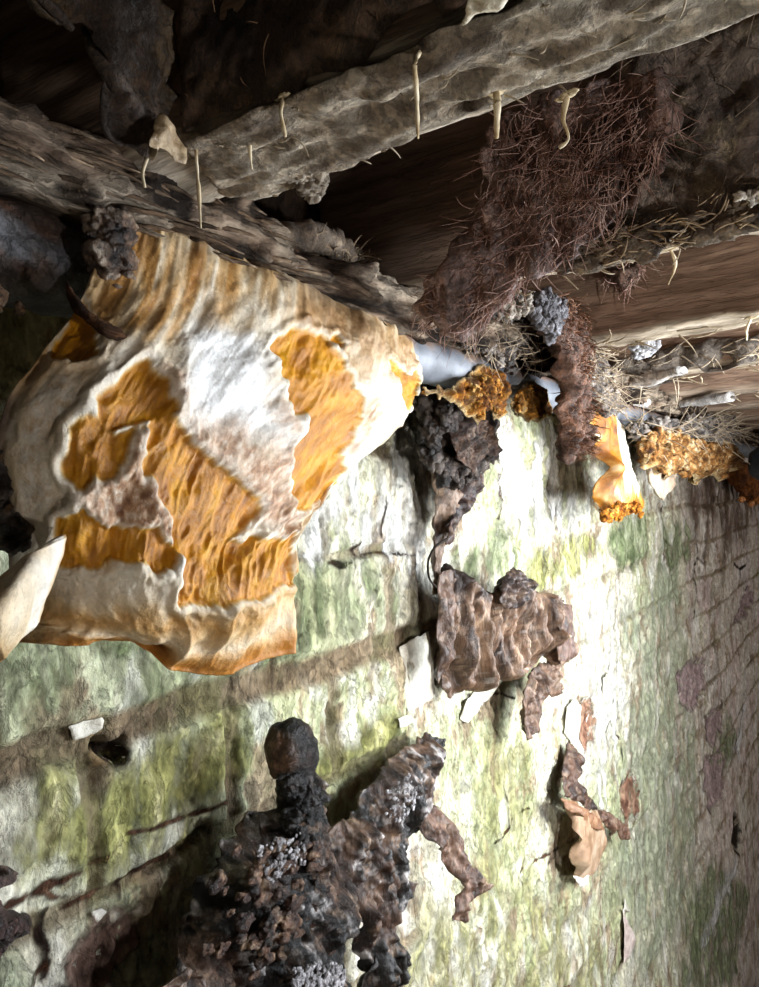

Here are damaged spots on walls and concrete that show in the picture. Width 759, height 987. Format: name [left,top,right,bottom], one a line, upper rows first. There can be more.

peeling [460,680,513,723]
spalling [619,770,640,825]
spalling [201,837,335,982]